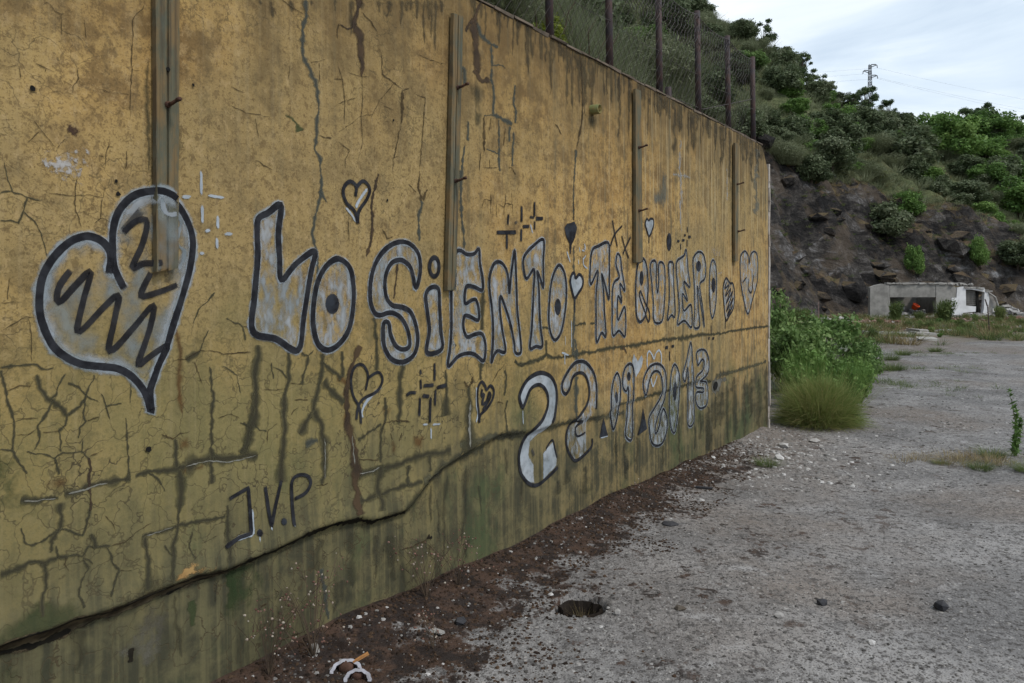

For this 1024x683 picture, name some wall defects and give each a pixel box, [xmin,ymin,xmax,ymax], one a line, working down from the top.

damp [379,0,442,49]
peeling [44,150,89,177]
crack [283,0,428,299]
crack [459,1,517,249]
crack [555,44,584,220]
damp [471,0,763,229]
crack [0,279,768,655]
damp [695,367,768,451]
damp [12,605,71,638]